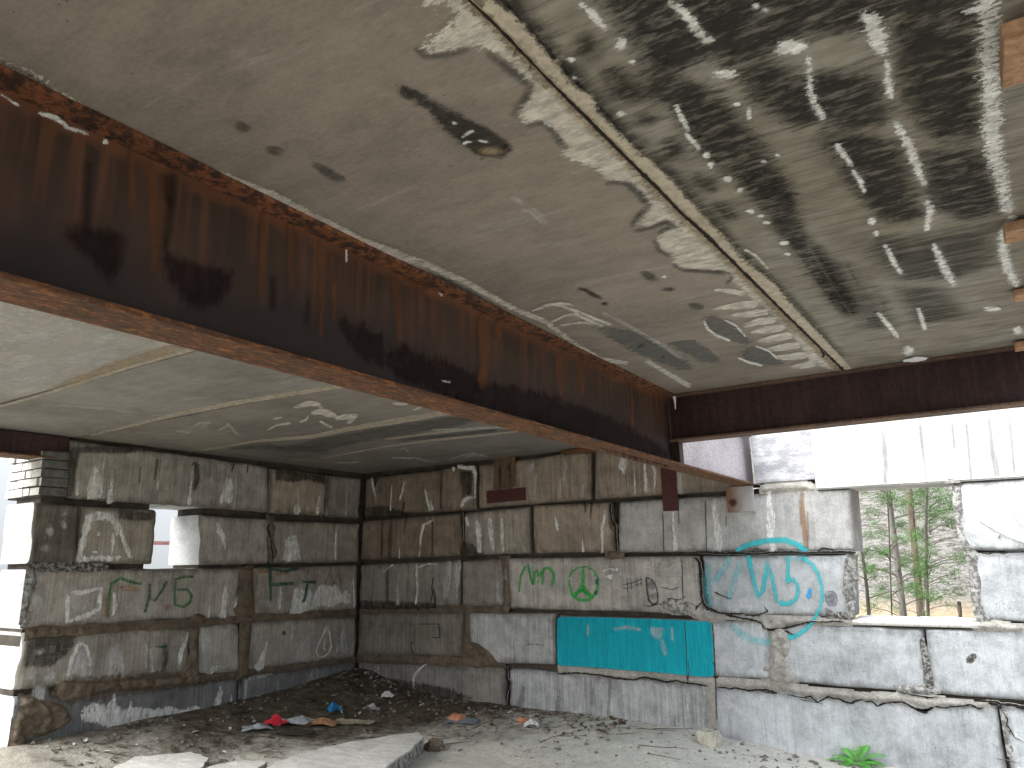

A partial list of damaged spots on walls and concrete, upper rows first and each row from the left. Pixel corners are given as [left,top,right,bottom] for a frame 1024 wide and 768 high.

leakage [400,86,513,160]
leakage [418,0,1022,370]
leakage [164,255,233,307]
spalling [461,613,505,668]
crack [557,496,1024,763]